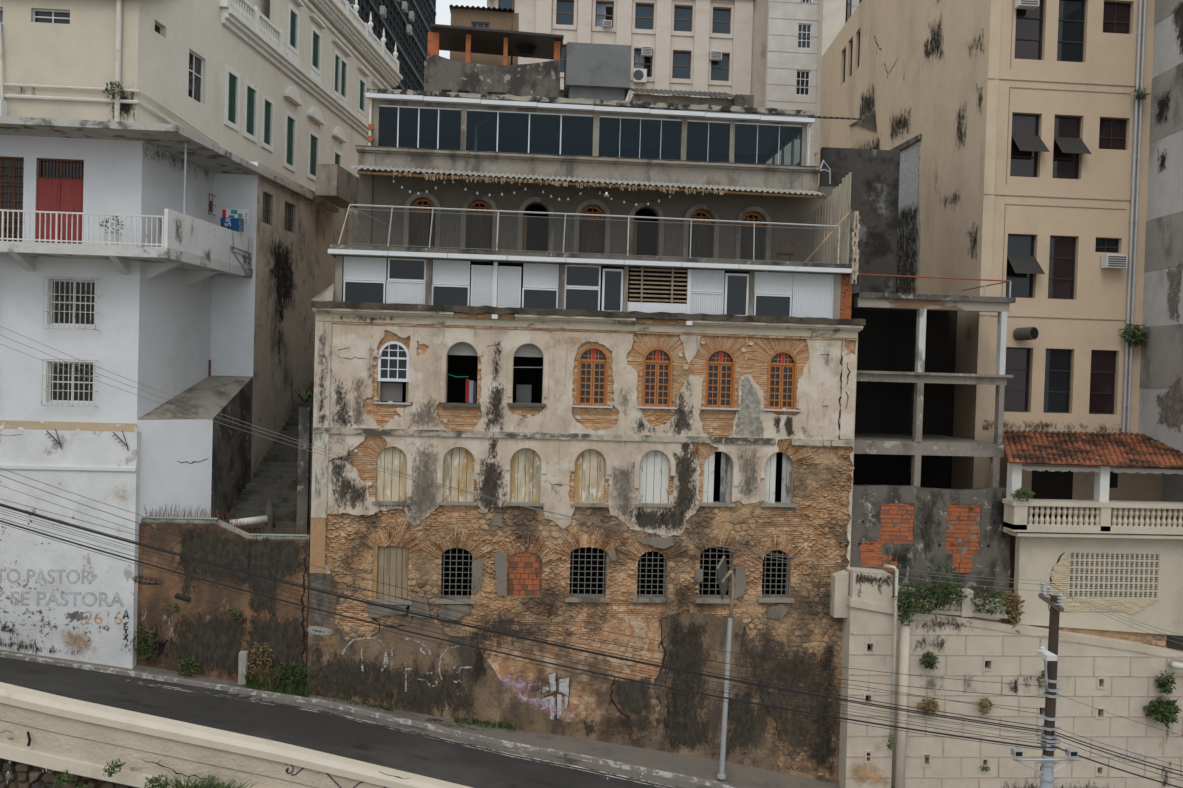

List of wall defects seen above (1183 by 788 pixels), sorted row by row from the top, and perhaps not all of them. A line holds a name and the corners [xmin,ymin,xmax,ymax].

mould [924,0,944,63]
leakage [1172,2,1183,54]
mould [859,85,911,140]
leakage [1155,92,1170,123]
leakage [316,343,372,514]
leakage [403,448,438,521]
leakage [477,342,507,512]
leakage [613,382,699,532]
peeling [0,556,110,649]
spalling [325,330,885,782]
spalling [1050,554,1159,614]